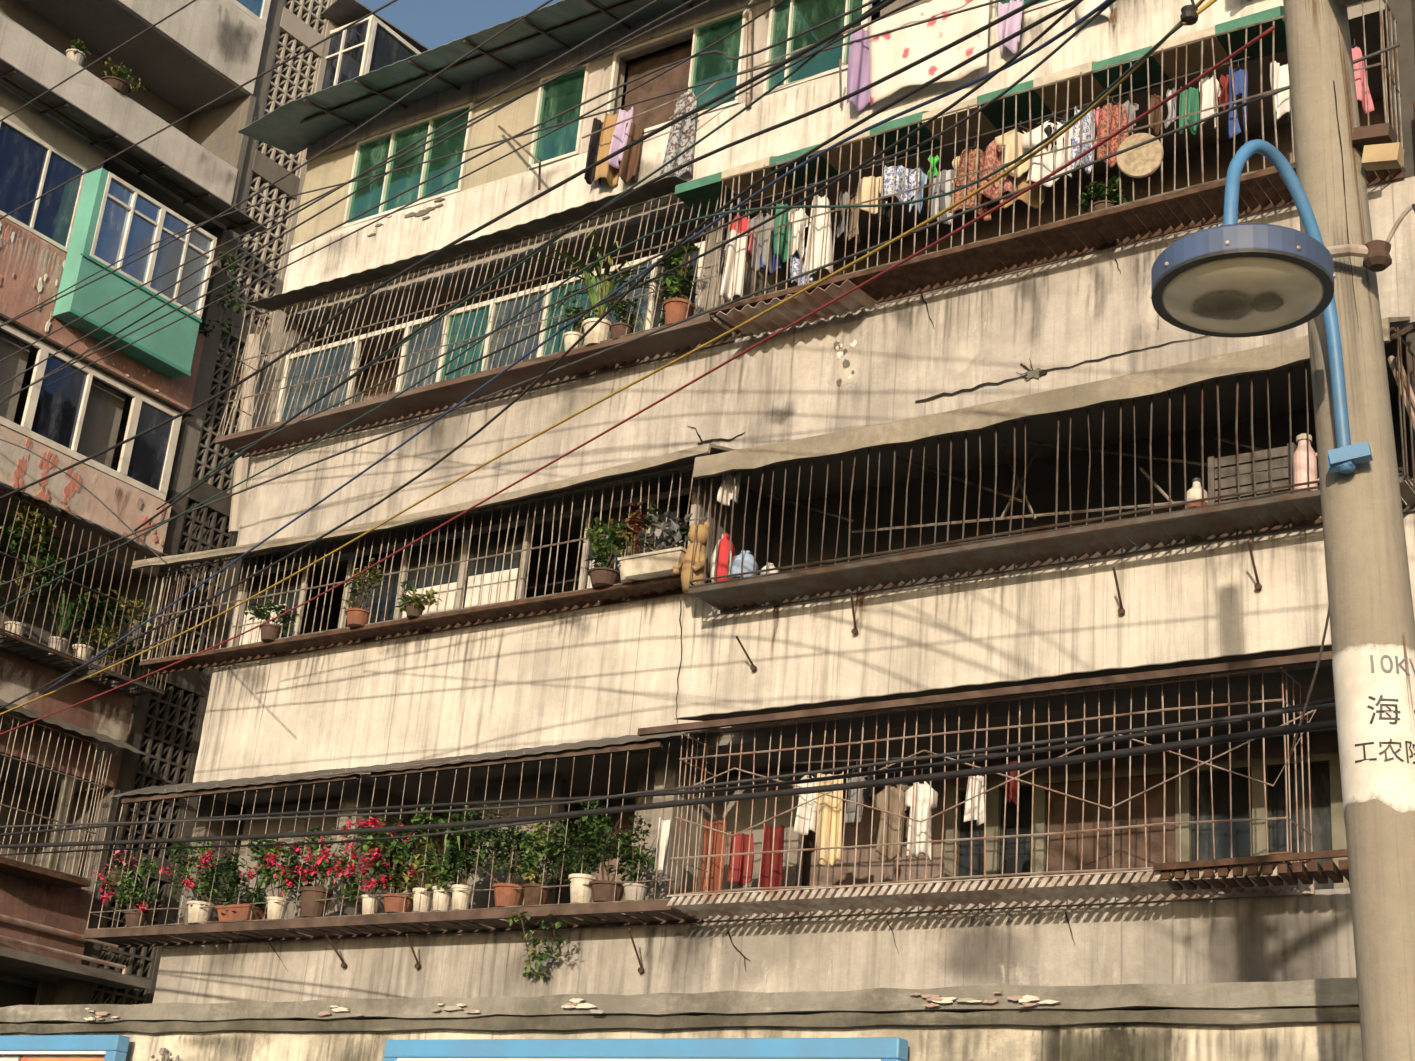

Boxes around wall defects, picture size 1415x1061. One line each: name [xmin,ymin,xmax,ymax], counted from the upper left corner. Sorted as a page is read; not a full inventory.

leakage [222,27,242,55]
peeling [0,223,22,248]
peeling [33,260,65,332]
leakage [1136,284,1157,323]
spalling [833,339,857,386]
peeling [12,437,81,521]
leakage [1216,911,1315,982]
leakage [742,973,796,993]
spalling [910,992,1060,1008]